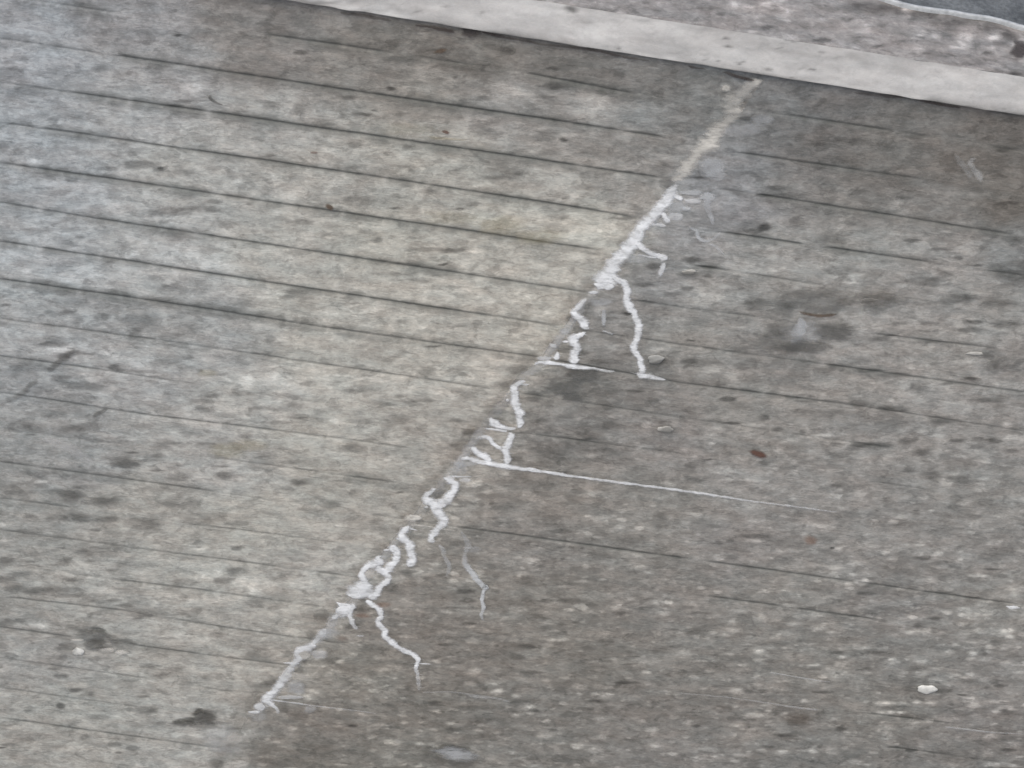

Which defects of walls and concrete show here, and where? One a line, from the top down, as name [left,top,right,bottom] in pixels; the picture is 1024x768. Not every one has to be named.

water stain [534,122,727,380]
water stain [462,381,732,499]
efflorescence [333,476,460,670]
water stain [463,563,488,610]
water stain [249,644,316,713]